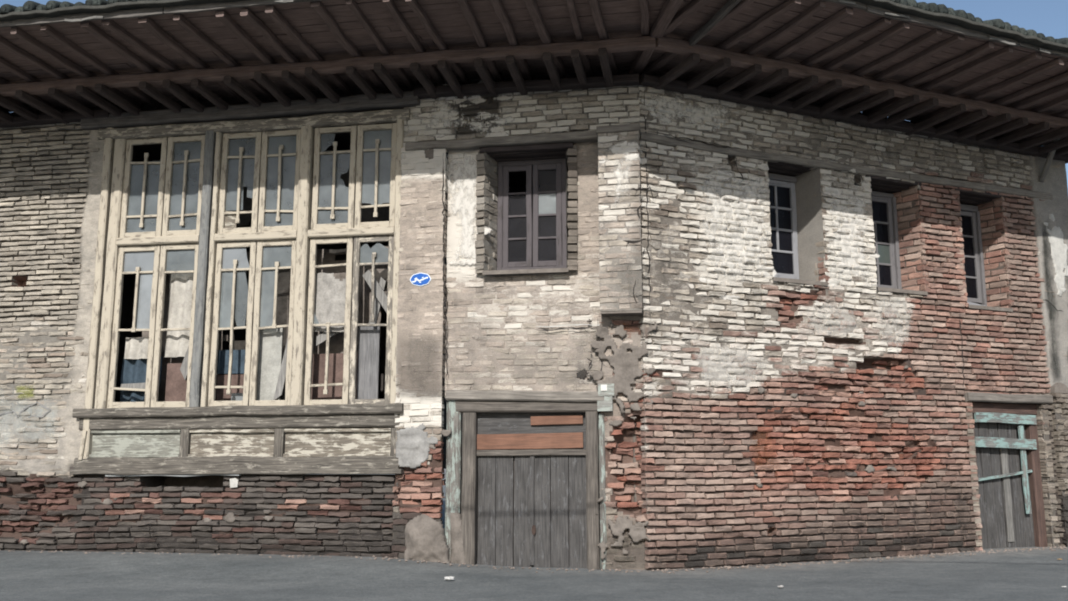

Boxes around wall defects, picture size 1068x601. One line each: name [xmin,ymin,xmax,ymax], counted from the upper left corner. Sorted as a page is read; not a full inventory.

flaking render [1043,213,1068,297]
spalling [577,319,673,560]